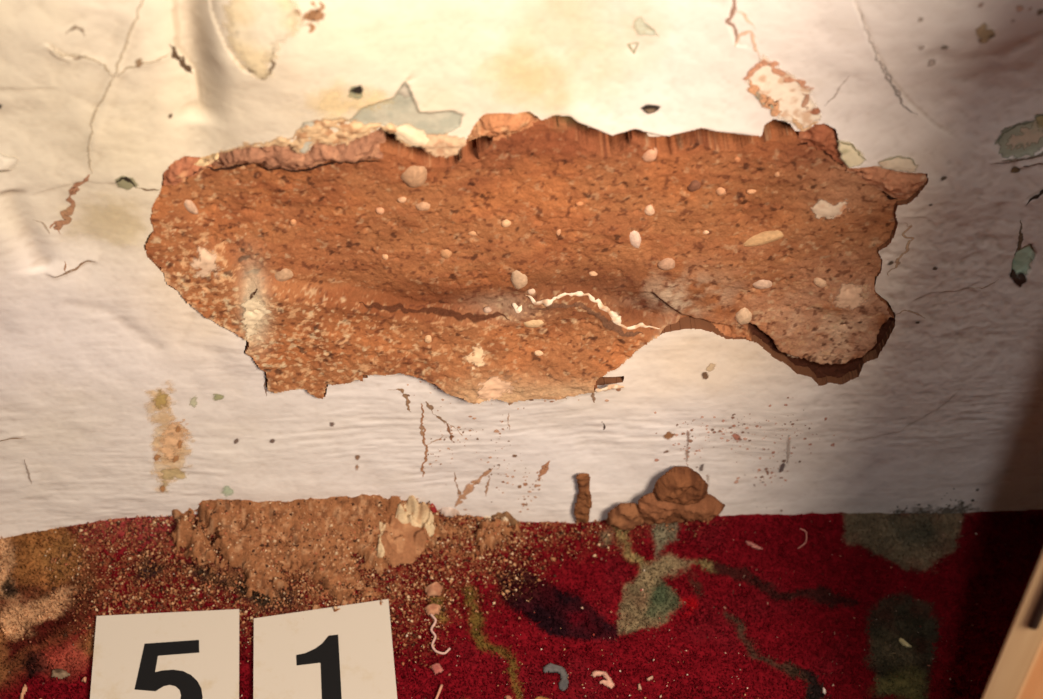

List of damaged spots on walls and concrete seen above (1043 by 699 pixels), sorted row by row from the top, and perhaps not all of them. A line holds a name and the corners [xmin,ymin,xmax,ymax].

peeling [224,0,325,80]
crack [726,0,760,59]
crack [50,0,193,174]
peeling [995,115,1043,173]
flaking render [116,57,927,404]
peeling [1010,220,1034,287]